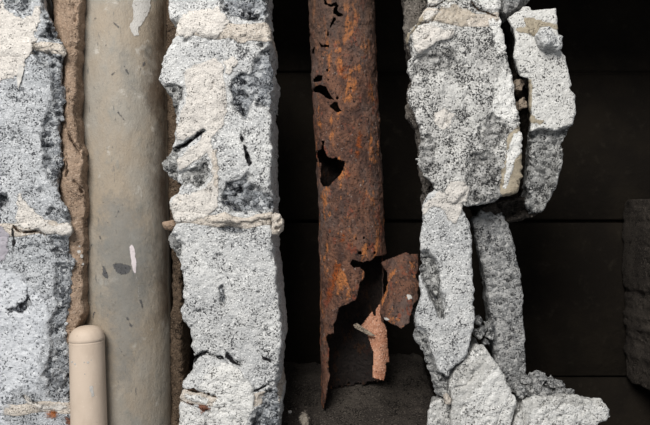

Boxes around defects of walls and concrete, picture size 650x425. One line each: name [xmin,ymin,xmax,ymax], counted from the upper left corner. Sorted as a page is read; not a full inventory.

crack [471,2,529,197]
crack [173,131,204,151]
crack [240,135,252,166]
spalling [168,235,182,257]